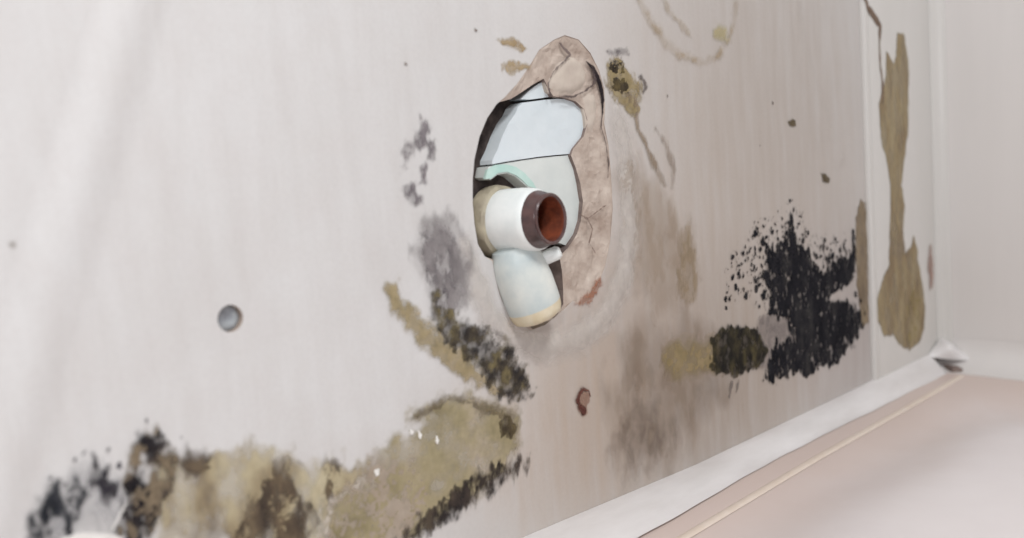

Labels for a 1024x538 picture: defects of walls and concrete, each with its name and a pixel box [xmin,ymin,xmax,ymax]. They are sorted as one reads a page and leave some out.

leakage [404,122,435,205]
spalling [475,35,612,318]
leakage [607,50,657,170]
leakage [663,0,925,397]
leakage [28,219,534,538]
rust [576,387,591,416]